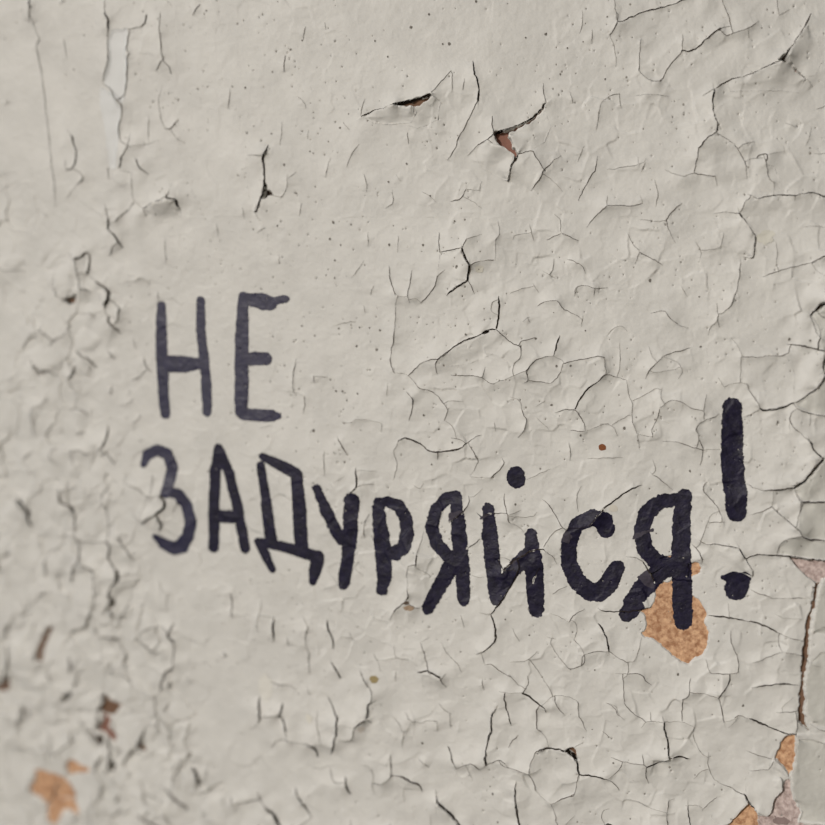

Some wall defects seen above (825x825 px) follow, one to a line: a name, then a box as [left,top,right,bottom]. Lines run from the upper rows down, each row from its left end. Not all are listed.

peeling [364,96,440,129]
peeling [475,113,551,181]
crack [22,0,185,641]
crack [16,499,32,526]
crack [138,599,191,698]
peeling [641,580,709,663]
peeling [806,653,825,726]
peeling [30,708,144,825]
crack [145,759,280,825]
peeling [711,735,825,825]